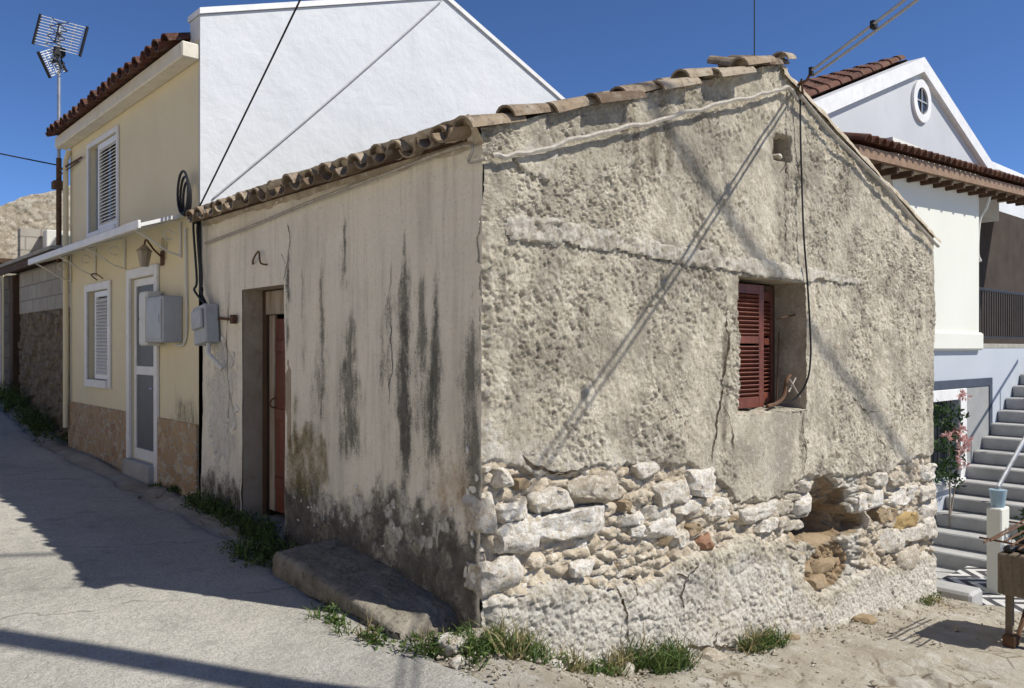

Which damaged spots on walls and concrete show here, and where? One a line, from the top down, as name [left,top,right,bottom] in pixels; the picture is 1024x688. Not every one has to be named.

damp [340,317,357,455]
damp [387,244,440,472]
damp [462,326,481,498]
crack [712,308,735,462]
damp [284,474,477,631]
spalling [374,455,938,600]